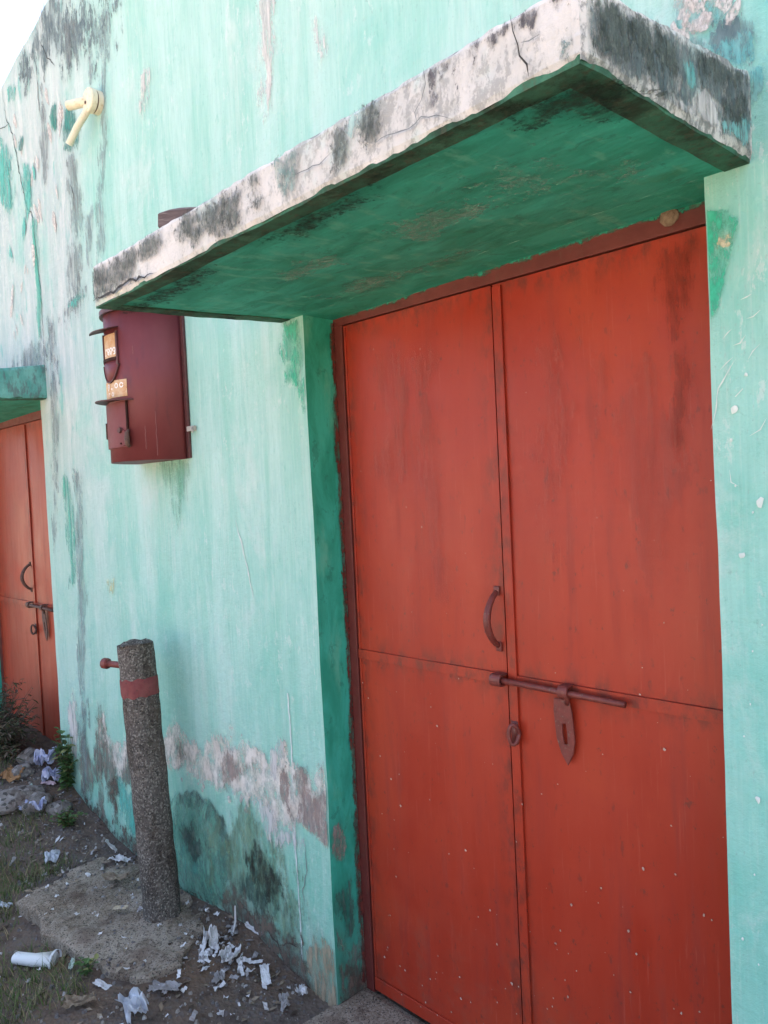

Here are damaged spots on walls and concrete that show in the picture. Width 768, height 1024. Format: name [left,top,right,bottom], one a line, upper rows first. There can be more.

water stain [19,0,121,96]
water stain [428,64,458,106]
water stain [473,9,537,64]
crack [510,17,539,77]
water stain [590,0,764,151]
peeling [670,0,741,39]
water stain [330,100,381,175]
spalling [68,697,78,757]
spalling [98,713,129,779]
spalling [164,722,346,861]
water stain [239,841,291,919]